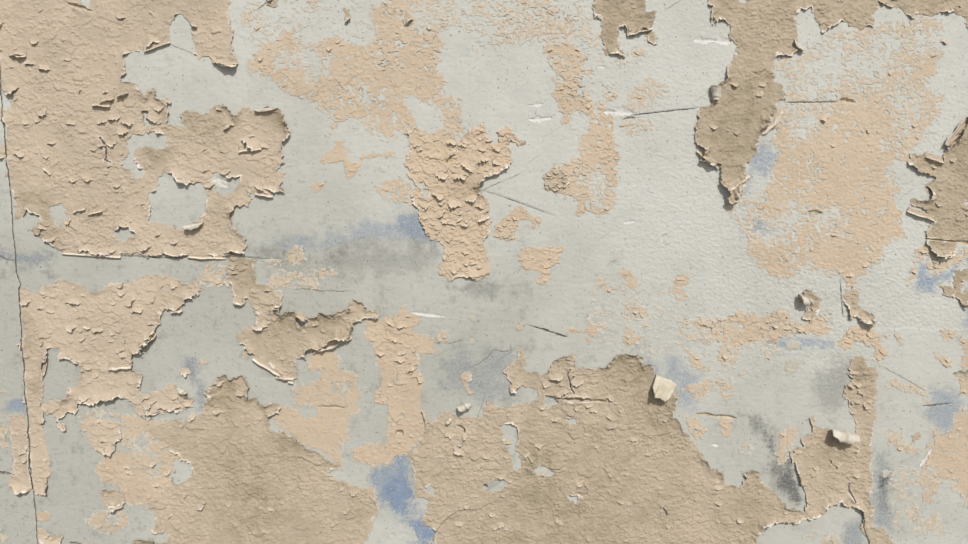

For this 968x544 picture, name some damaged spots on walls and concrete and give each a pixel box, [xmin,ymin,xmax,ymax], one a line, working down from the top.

crack [0,78,38,544]
peeling [0,0,291,259]
peeling [0,253,895,544]
peeling [240,0,670,281]
peeling [518,246,564,289]
peeling [693,0,968,367]
peeling [884,405,968,539]